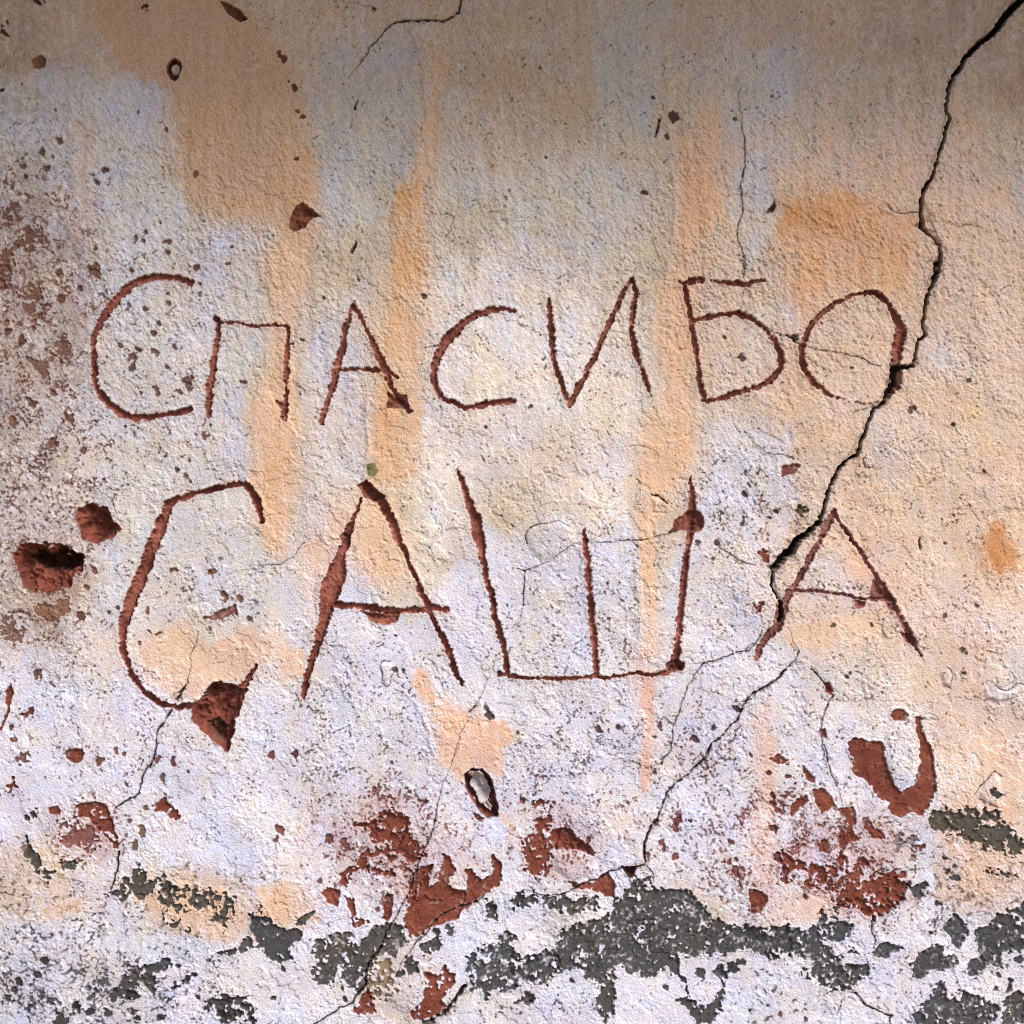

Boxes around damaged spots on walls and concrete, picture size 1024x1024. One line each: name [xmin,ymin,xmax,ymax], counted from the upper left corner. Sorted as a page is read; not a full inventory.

crack [348,0,463,129]
crack [512,0,1024,897]
spalling [0,502,123,647]
peeling [483,703,495,722]
peeling [22,708,1024,1024]
peeling [4,956,49,1002]